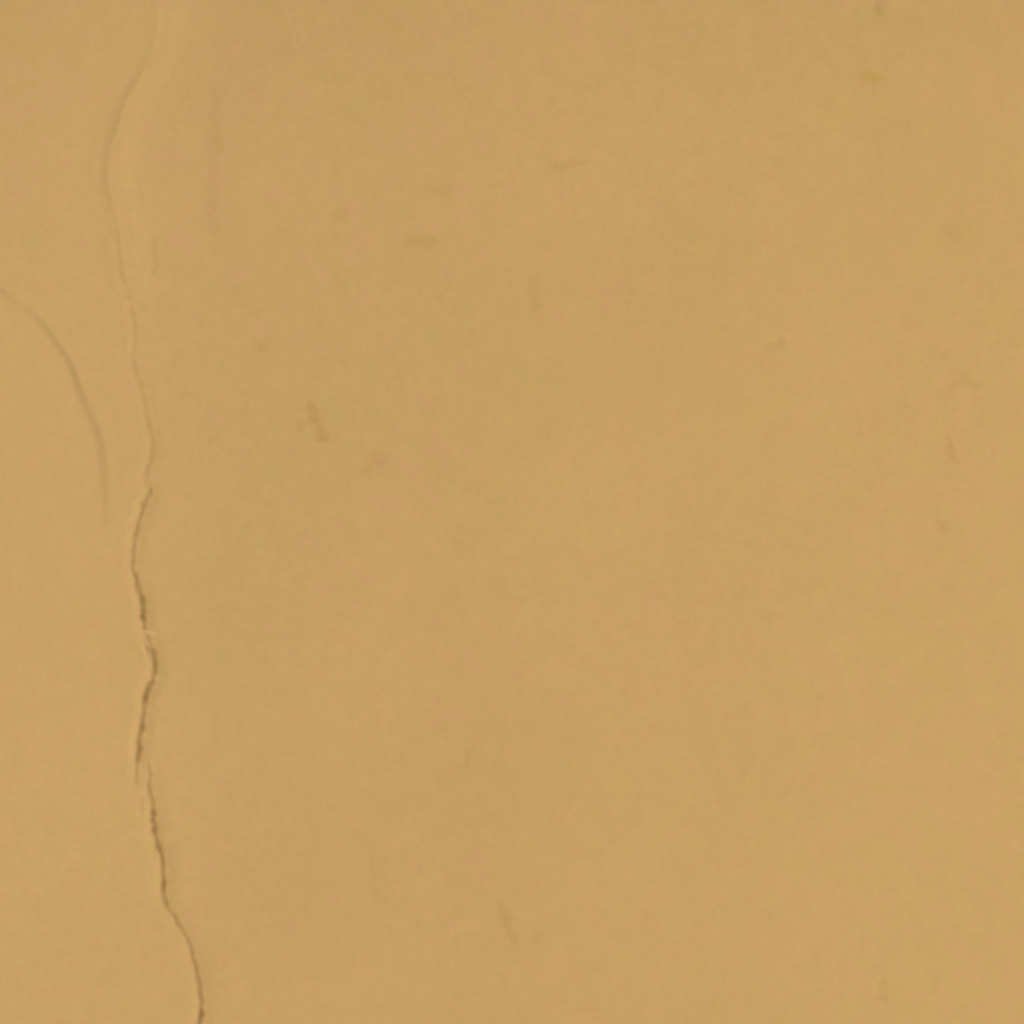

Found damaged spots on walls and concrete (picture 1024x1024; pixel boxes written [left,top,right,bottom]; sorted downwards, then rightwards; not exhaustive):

crack [93,0,221,1024]